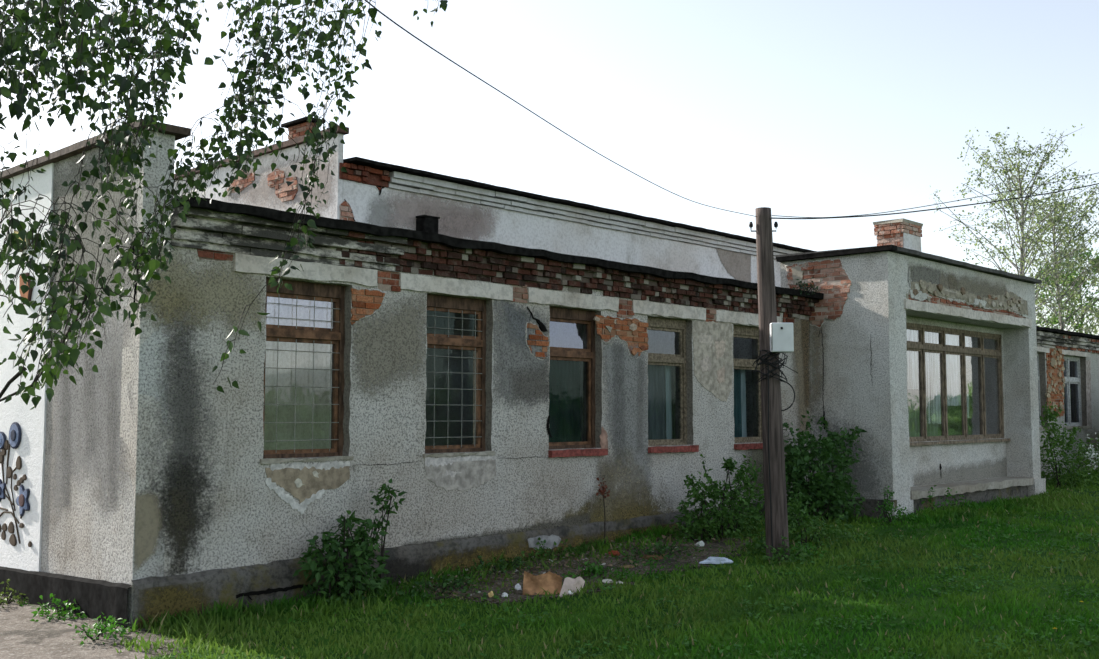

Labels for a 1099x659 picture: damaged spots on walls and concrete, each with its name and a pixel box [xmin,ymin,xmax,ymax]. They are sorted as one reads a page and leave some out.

flaking render [223,169,298,202]
flaking render [350,270,401,327]
flaking render [525,319,549,360]
flaking render [593,298,649,359]
flaking render [781,257,853,328]
peeling [906,280,1029,328]
flaking render [1045,347,1075,418]
damp [51,315,128,513]
damp [149,310,210,571]
damp [409,343,650,545]
peeling [265,460,351,514]